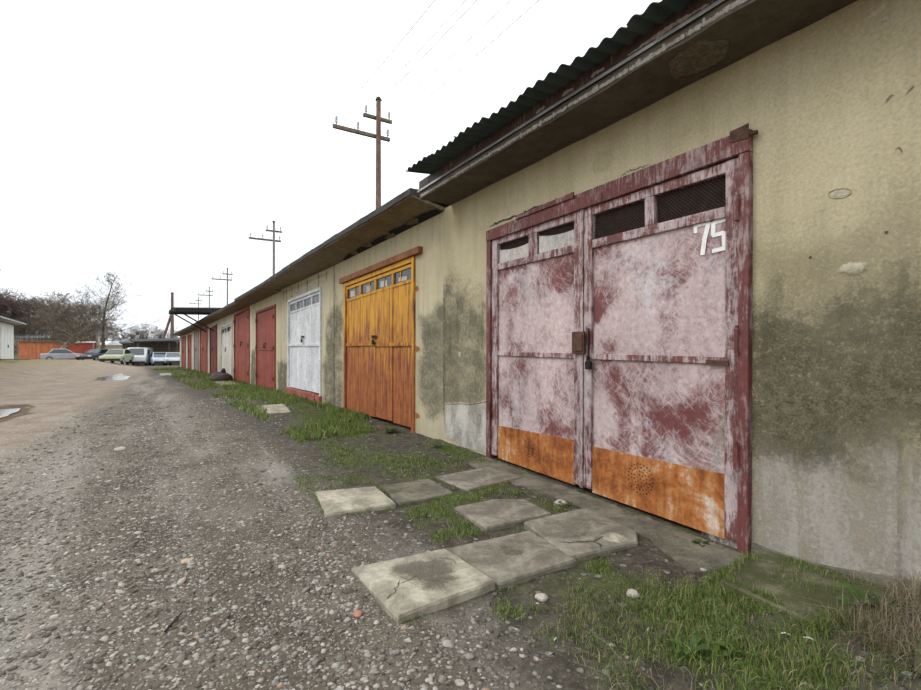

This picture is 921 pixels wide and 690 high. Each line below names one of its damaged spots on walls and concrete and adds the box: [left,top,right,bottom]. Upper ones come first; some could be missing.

water stain [324,306,342,407]
water stain [419,285,486,417]
water stain [751,287,921,579]